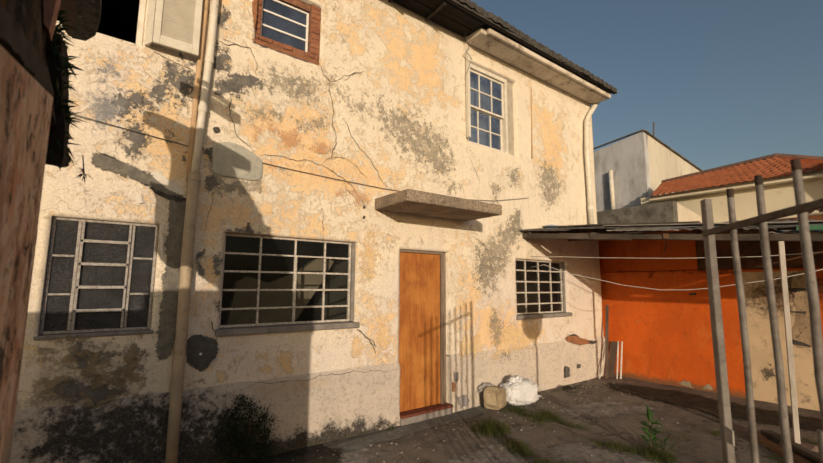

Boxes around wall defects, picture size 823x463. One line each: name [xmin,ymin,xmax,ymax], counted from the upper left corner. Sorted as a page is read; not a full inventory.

leakage [217,4,231,29]
leakage [88,52,203,160]
peeling [253,124,335,154]
crack [226,67,383,207]
leakage [212,43,456,175]
peeling [336,188,369,218]
leakage [538,161,563,209]
peeling [473,210,522,297]
leakage [745,276,794,315]
leakage [31,333,149,422]
crack [233,329,396,392]
peeling [459,309,542,361]